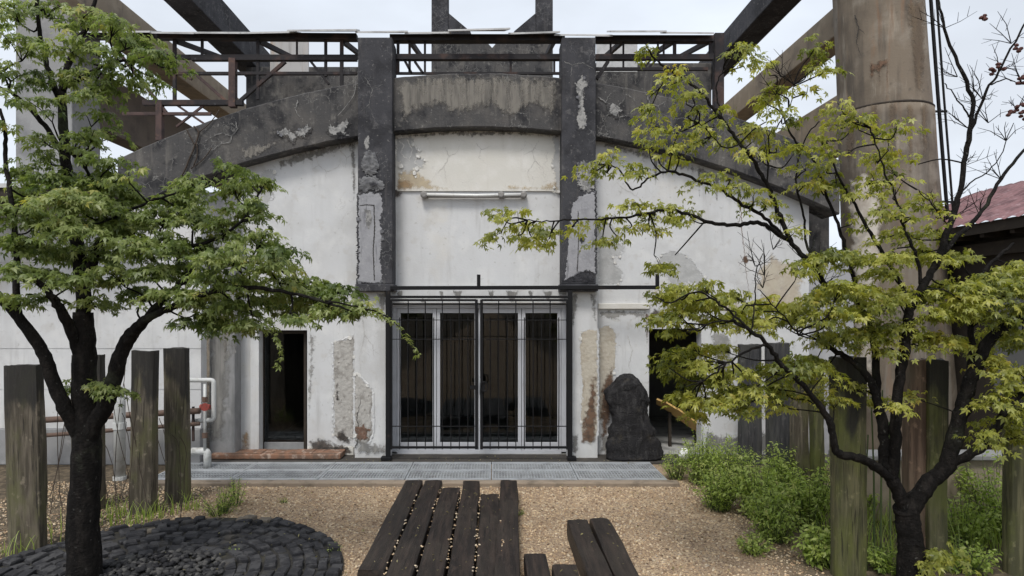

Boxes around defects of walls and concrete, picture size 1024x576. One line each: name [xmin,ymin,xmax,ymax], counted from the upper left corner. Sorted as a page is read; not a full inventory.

peeling [275,123,312,144]
peeling [325,117,351,138]
leakage [401,76,555,114]
peeling [573,73,593,131]
leakage [395,172,432,197]
peeling [562,160,626,286]
spalling [330,334,375,448]
spalling [578,323,618,446]